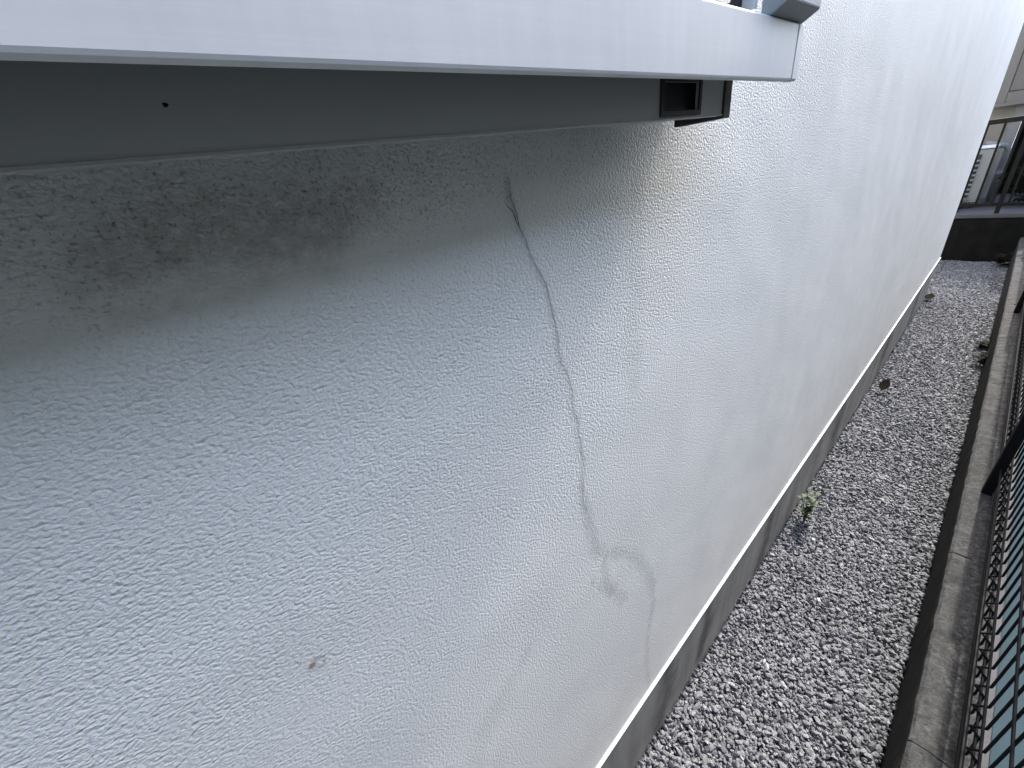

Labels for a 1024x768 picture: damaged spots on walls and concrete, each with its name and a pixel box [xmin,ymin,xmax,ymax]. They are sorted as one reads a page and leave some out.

crack [506,179,584,462]